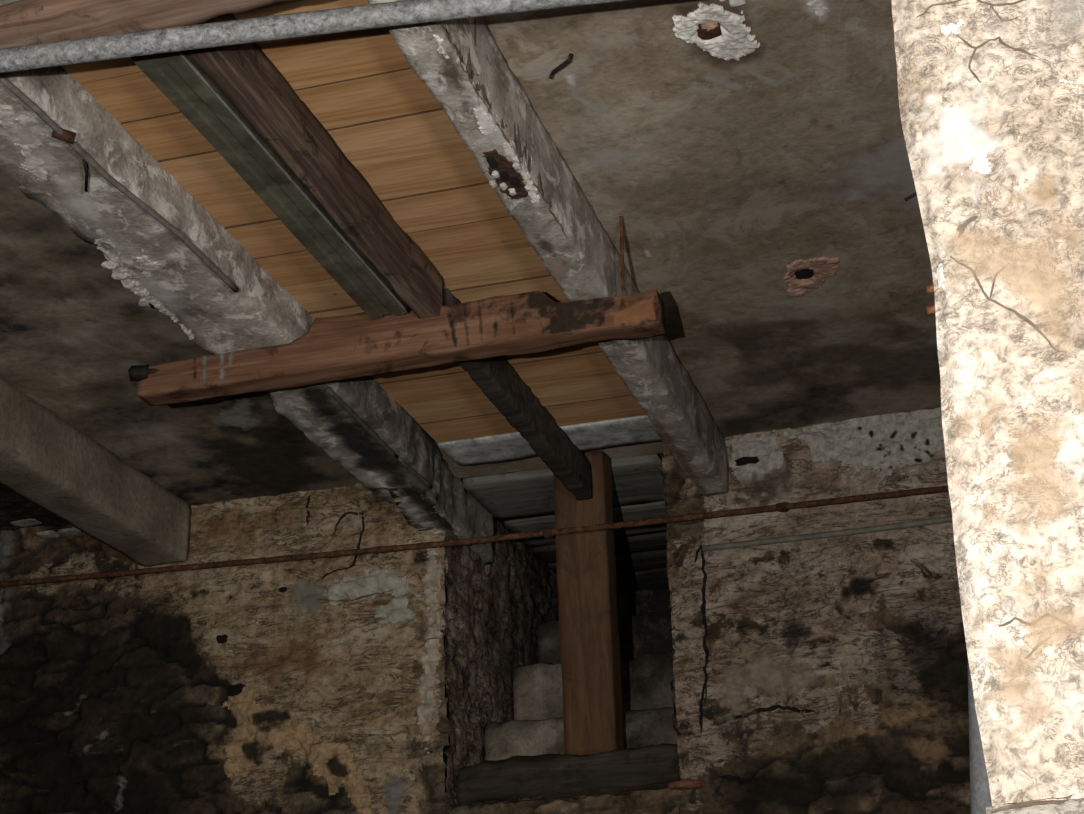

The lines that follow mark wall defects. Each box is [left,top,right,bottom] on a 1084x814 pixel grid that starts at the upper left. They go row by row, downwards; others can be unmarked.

peeling [433,34,450,59]
spalling [672,0,760,63]
spalling [473,97,541,207]
damp [843,578,874,596]
crack [695,545,818,735]
damp [782,623,807,648]
damp [918,644,968,685]